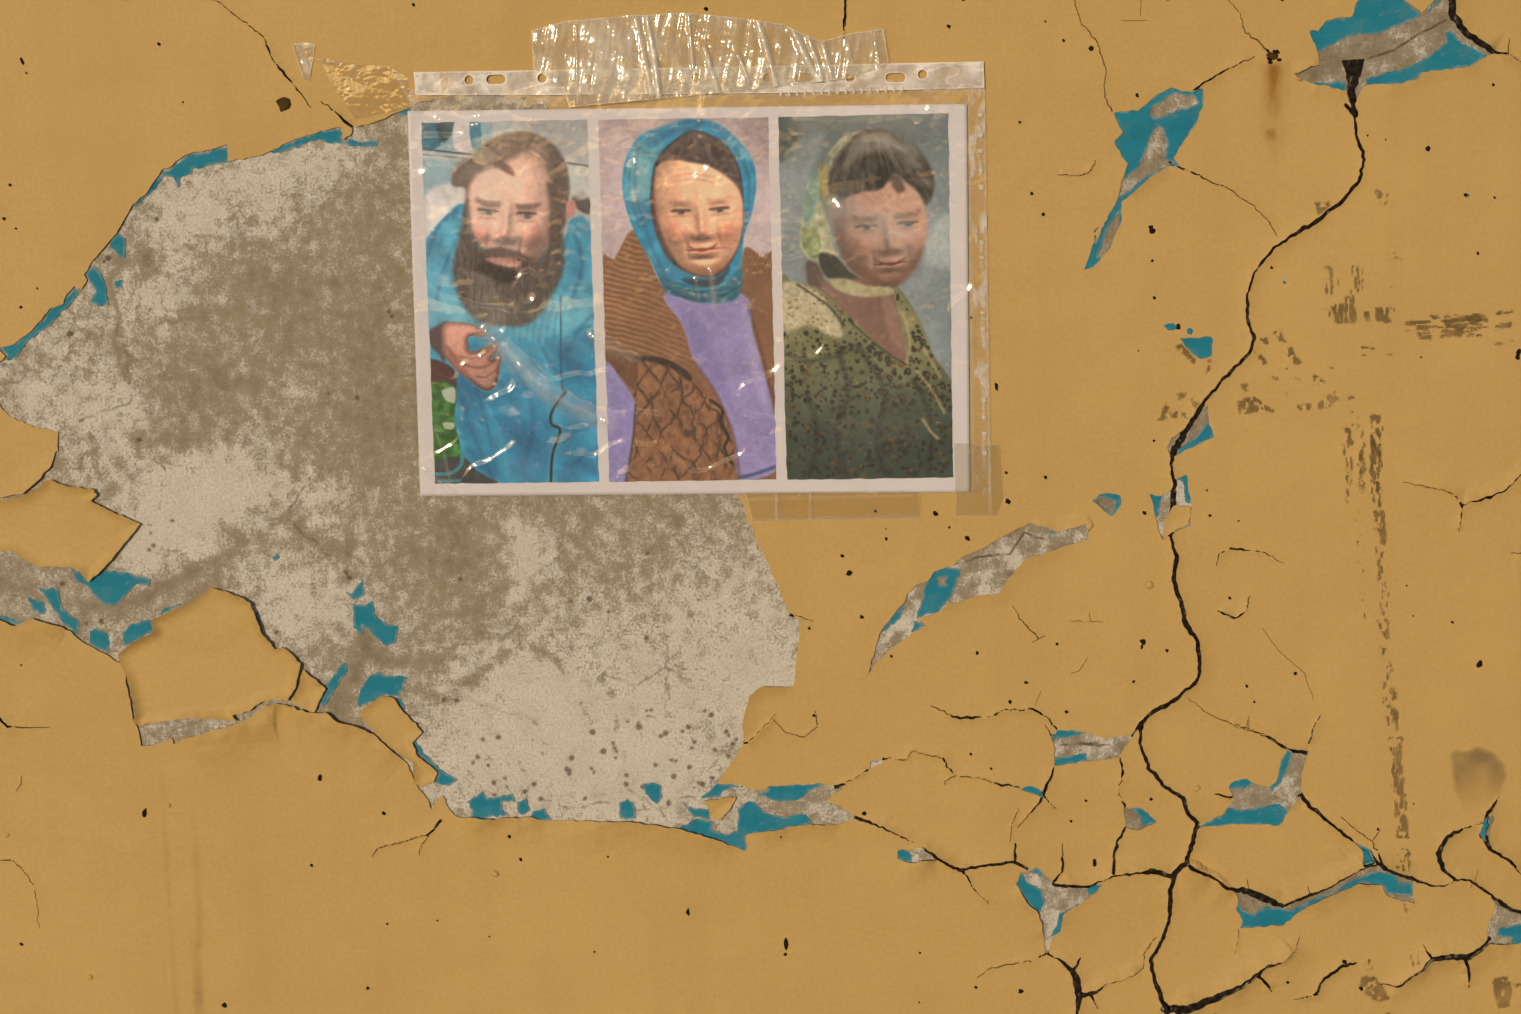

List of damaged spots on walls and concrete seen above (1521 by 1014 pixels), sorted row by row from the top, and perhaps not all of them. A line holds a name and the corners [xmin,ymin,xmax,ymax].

crack [214,0,353,128]
crack [841,0,849,39]
crack [1074,0,1147,112]
crack [1193,0,1269,93]
peeling [1294,0,1491,100]
crack [1448,0,1521,62]
peeling [1084,88,1204,271]
peeling [0,92,855,851]
peeling [1092,493,1122,516]
crack [834,59,1521,1014]
peeling [866,523,1089,680]
crack [0,718,50,728]